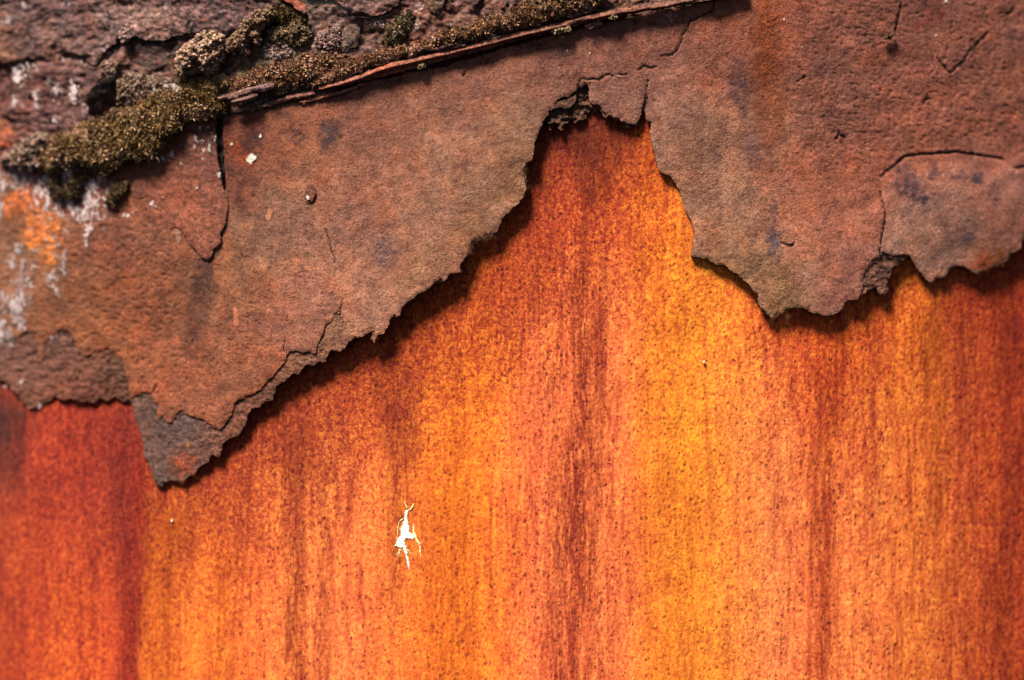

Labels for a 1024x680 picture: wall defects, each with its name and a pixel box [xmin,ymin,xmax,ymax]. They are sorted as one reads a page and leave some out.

water stain [11,61,85,108]
crack [214,118,227,188]
water stain [320,119,342,148]
rust [0,0,1024,486]
crack [873,151,1024,261]
crack [938,6,1014,73]
rust [560,243,602,680]
rust [283,434,304,680]
rust [808,448,834,680]